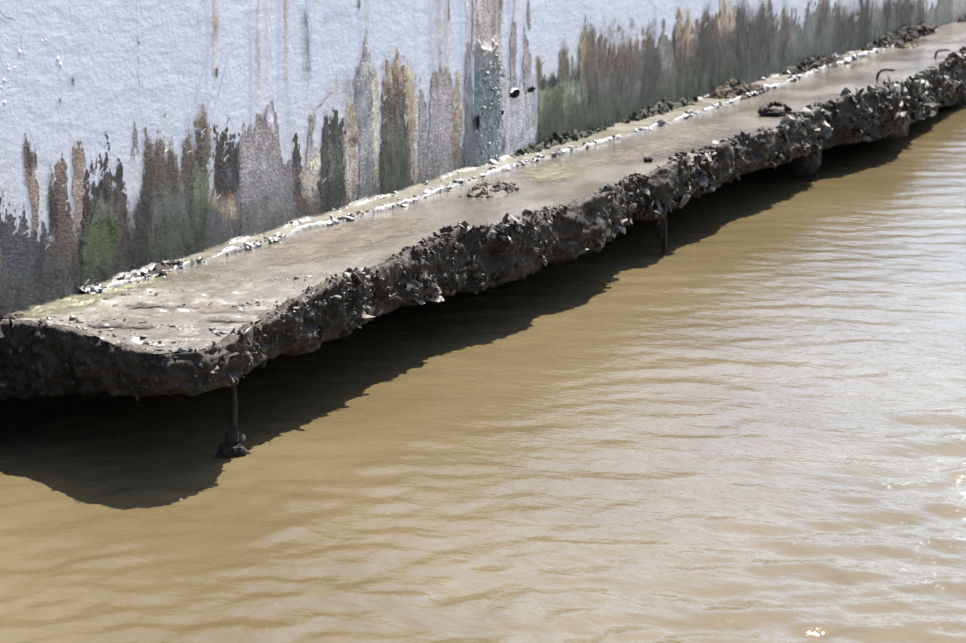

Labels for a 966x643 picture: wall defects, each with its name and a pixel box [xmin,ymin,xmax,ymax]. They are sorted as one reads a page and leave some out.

crack [0,11,27,82]
peeling [0,101,323,316]
water stain [0,0,538,312]
flaking render [344,100,359,204]
peeling [371,52,420,194]
peeling [341,255,485,337]
peeling [439,209,554,269]
peeling [567,141,734,259]
peeling [595,0,815,129]
peeling [840,46,966,122]
water stain [936,0,966,27]
spalling [199,325,280,458]